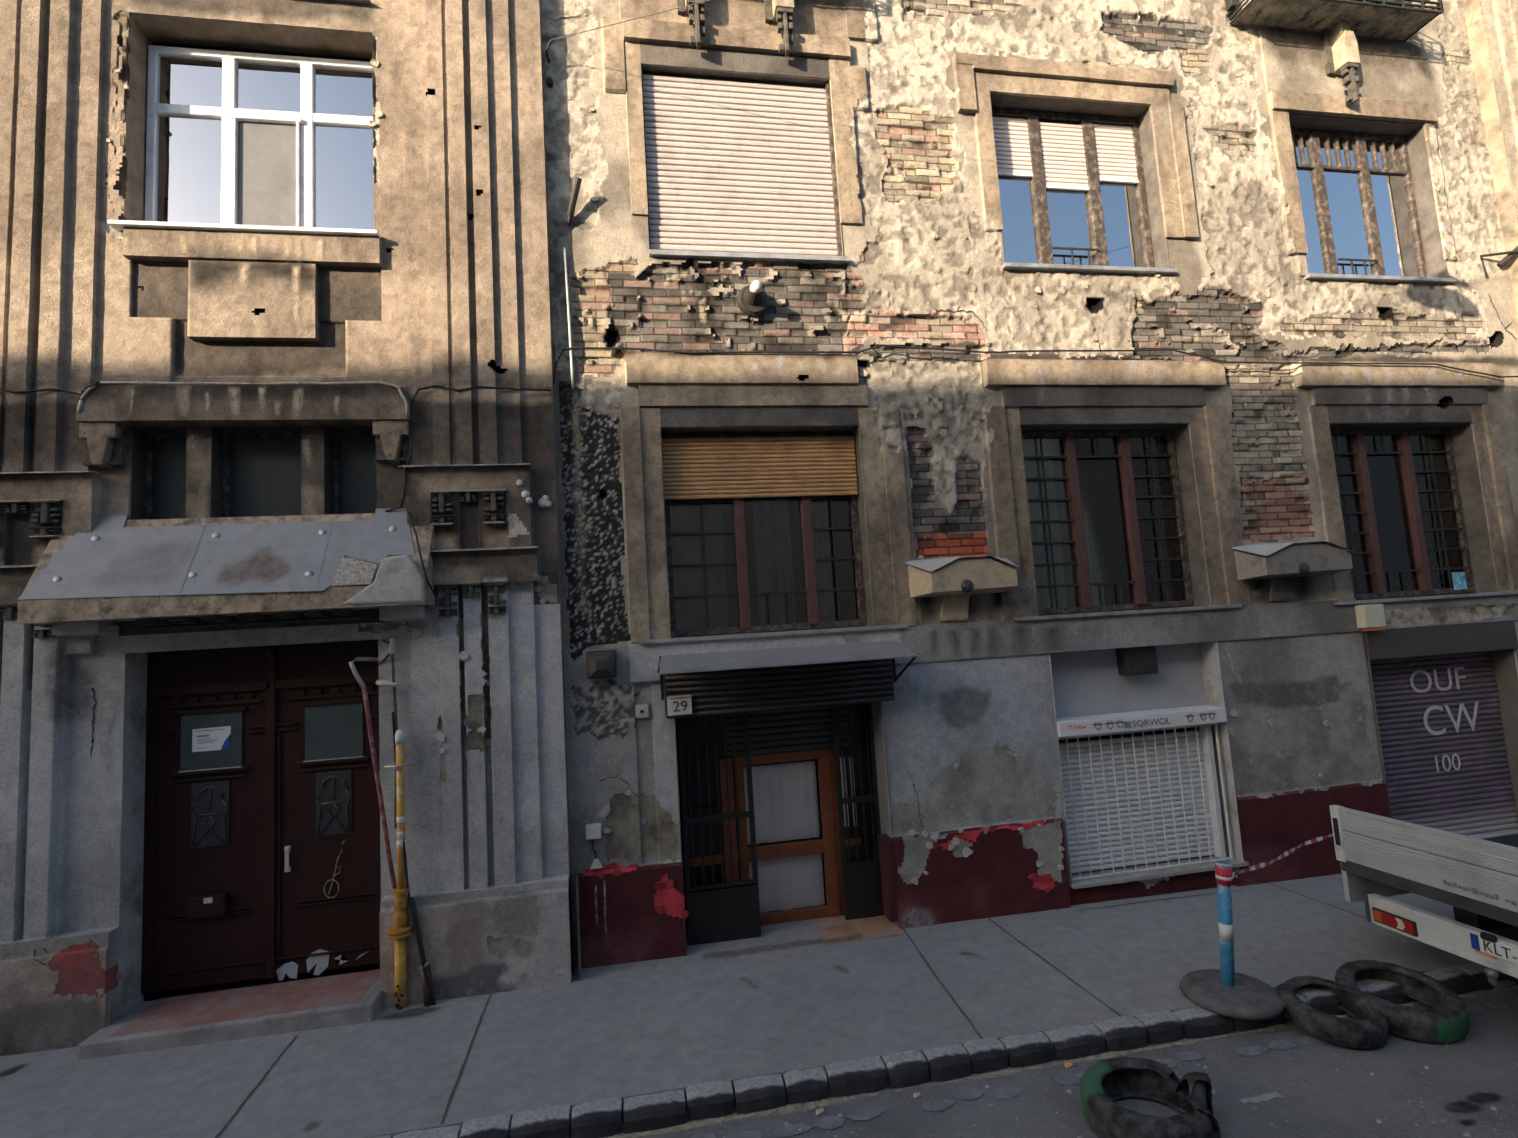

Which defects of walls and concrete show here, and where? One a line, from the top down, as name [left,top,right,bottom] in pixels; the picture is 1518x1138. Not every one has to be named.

flaking render [541,0,1508,559]
crack [89,687,97,758]
peeling [583,789,689,920]
peeling [898,819,1065,893]
peeling [42,940,125,1000]